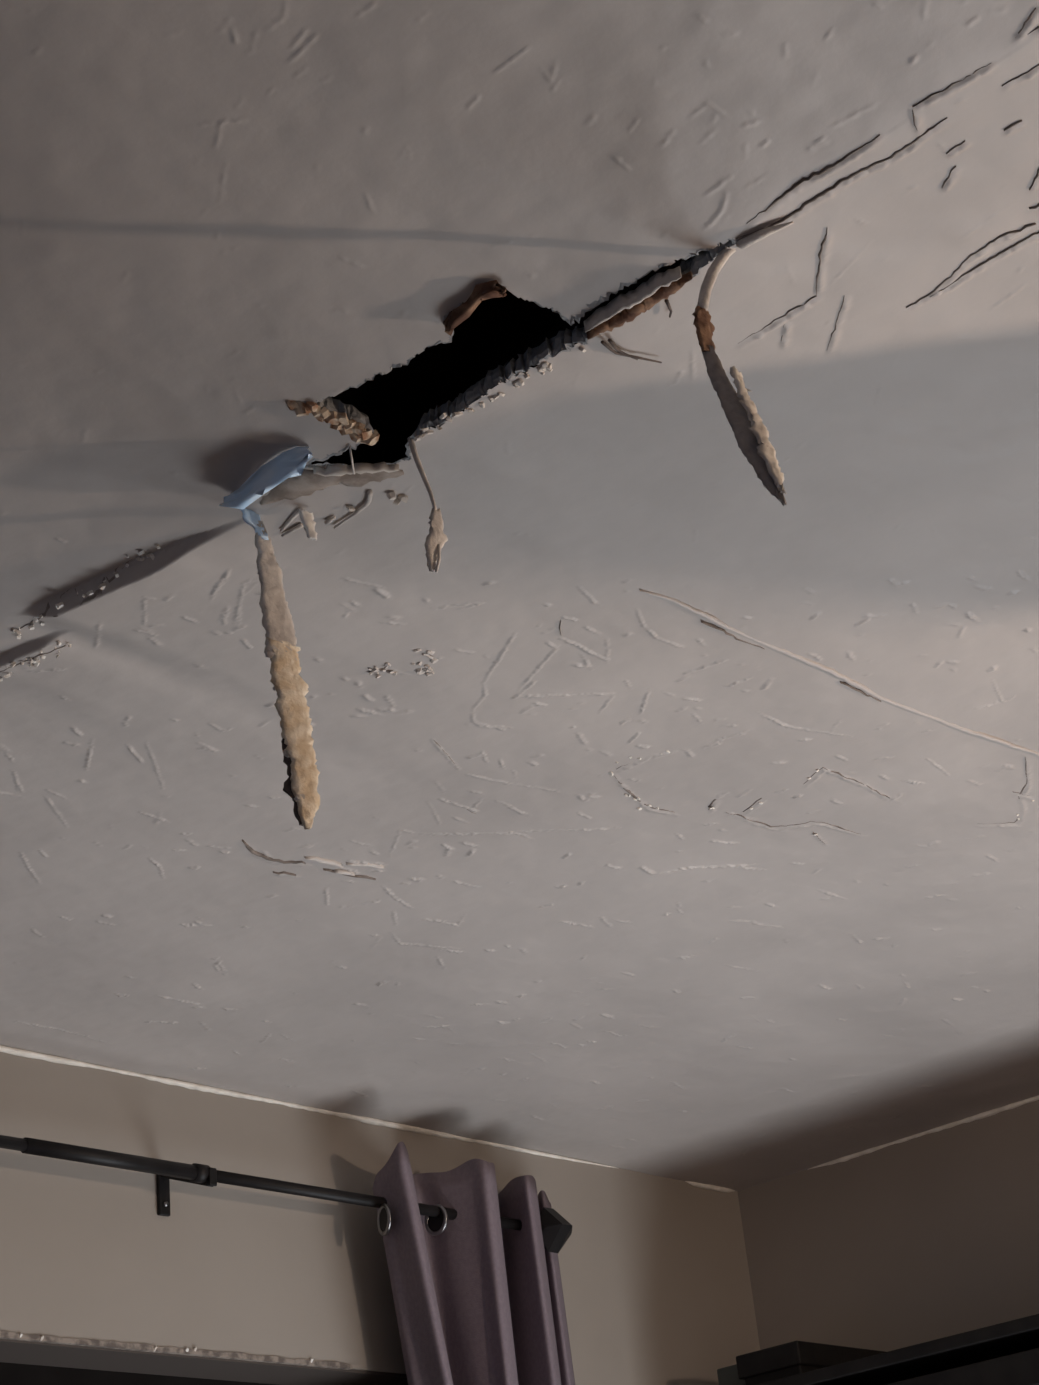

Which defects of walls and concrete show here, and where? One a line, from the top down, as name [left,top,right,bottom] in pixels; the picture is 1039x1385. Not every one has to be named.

crack [735,8,1039,350]
spalling [286,257,691,467]
crack [700,619,765,650]
crack [840,681,881,702]